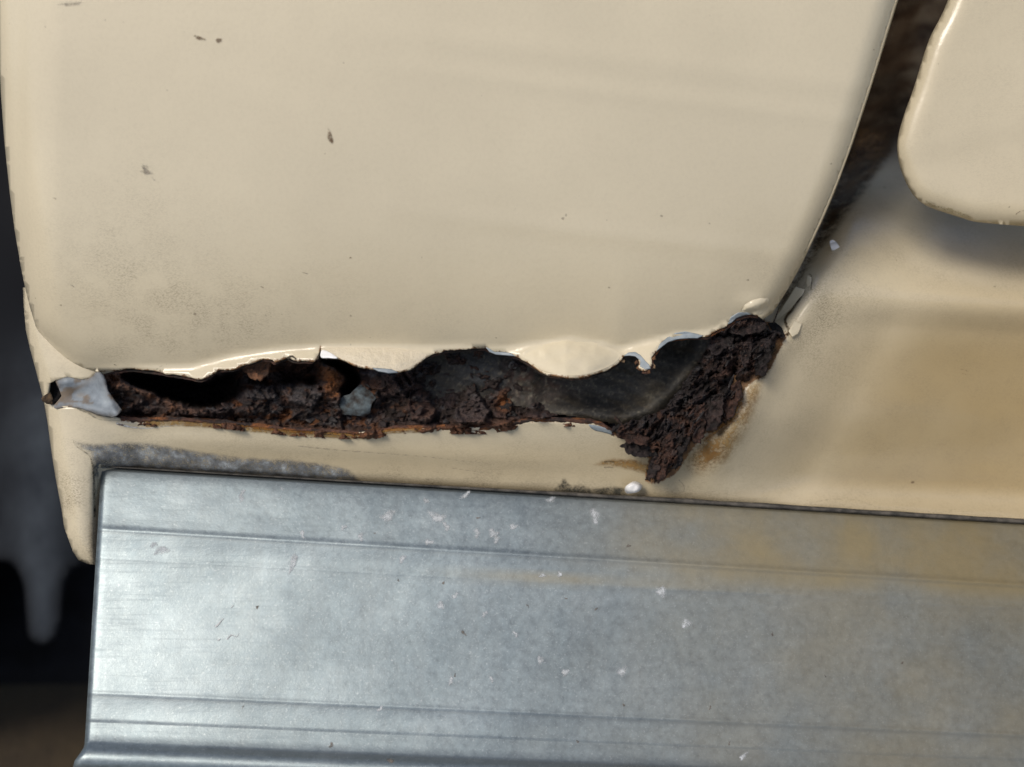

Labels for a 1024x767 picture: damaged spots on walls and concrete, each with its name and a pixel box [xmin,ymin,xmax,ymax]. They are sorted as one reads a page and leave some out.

peeling [41,372,149,429]
peeling [241,361,271,382]
peeling [320,347,426,374]
corrosion [602,314,785,481]
peeling [588,275,812,483]
corrosion [241,425,360,438]
peeling [81,443,356,517]